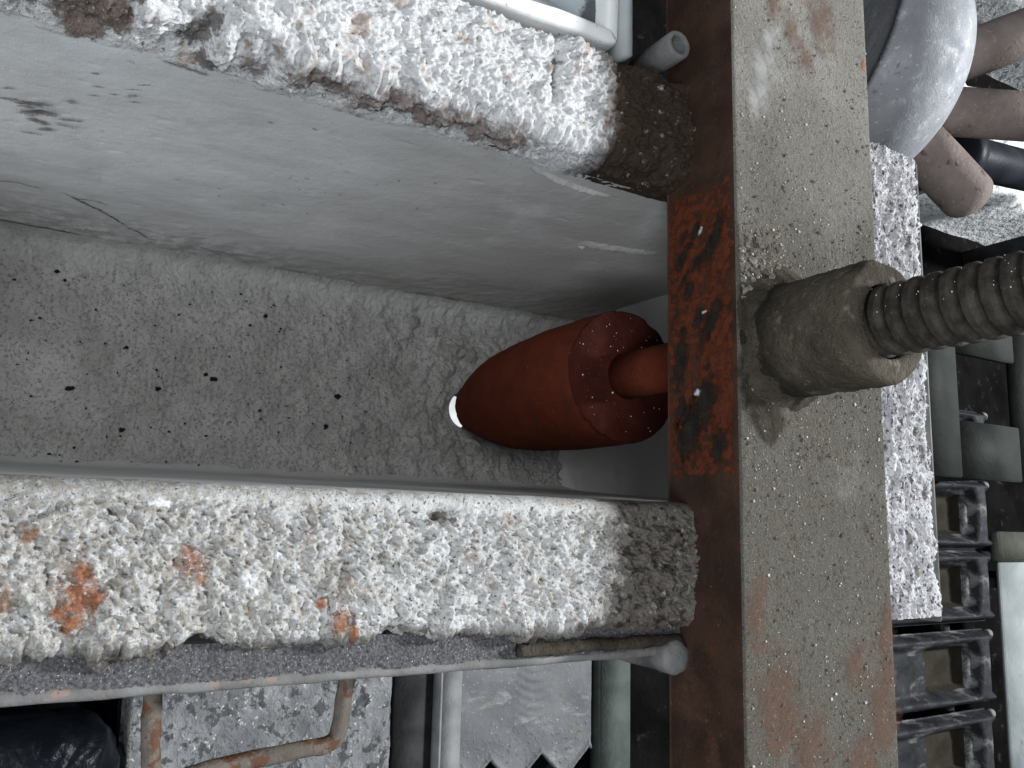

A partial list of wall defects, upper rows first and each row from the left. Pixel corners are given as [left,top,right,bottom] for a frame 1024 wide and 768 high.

crack [64,193,147,238]
corrosion [174,546,209,586]
corrosion [49,562,108,638]
corrosion [315,597,359,643]